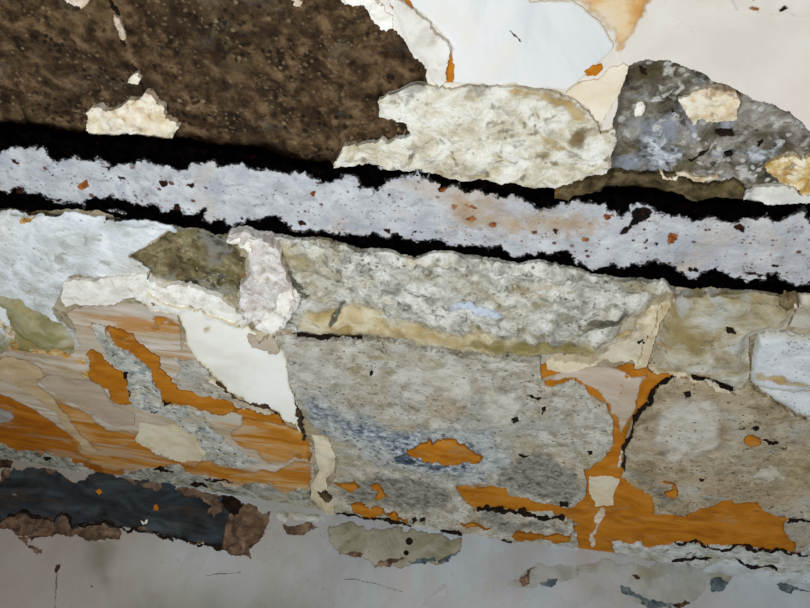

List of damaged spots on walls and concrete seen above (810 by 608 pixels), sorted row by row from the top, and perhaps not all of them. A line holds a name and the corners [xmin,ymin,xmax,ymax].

spalling [0,0,810,205]
spalling [0,208,810,608]
crack [18,536,42,555]
crack [53,564,61,608]